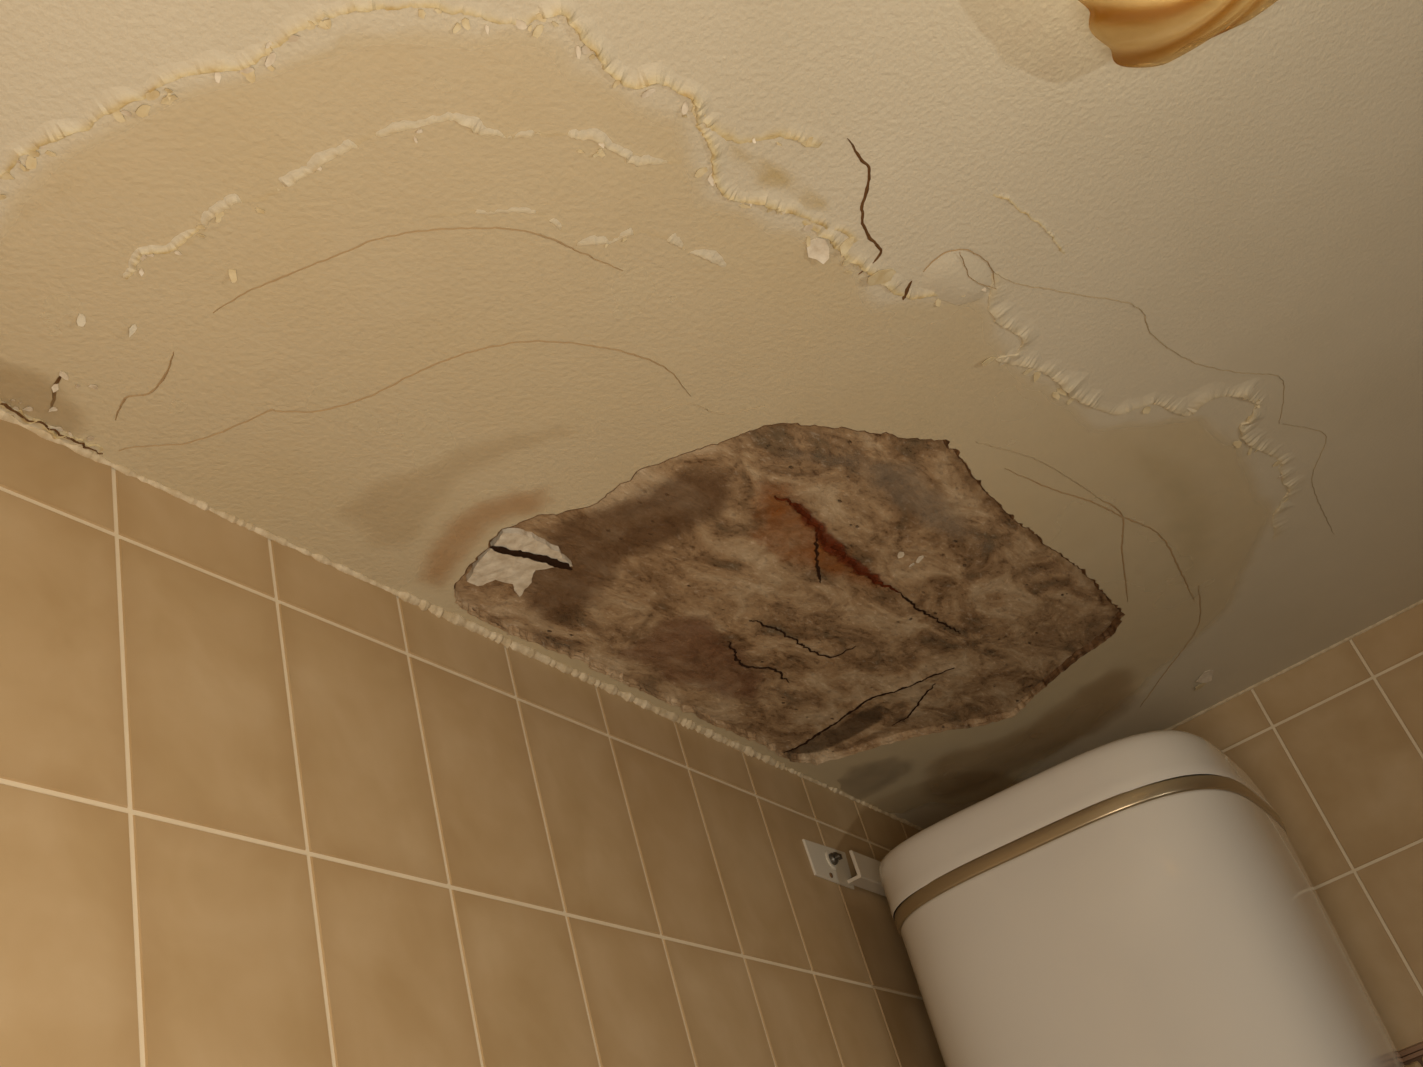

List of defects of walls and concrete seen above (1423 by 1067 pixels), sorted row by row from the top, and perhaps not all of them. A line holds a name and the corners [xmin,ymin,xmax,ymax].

peeling [0,0,941,307]
crack [847,138,882,275]
crack [213,227,623,313]
crack [902,281,912,300]
spalling [0,371,104,454]
crack [115,340,691,451]
damp [535,479,721,615]
spalling [454,423,1125,765]
crack [727,620,856,683]
corrosion [767,496,899,593]
crack [899,592,961,634]
crack [784,668,954,753]